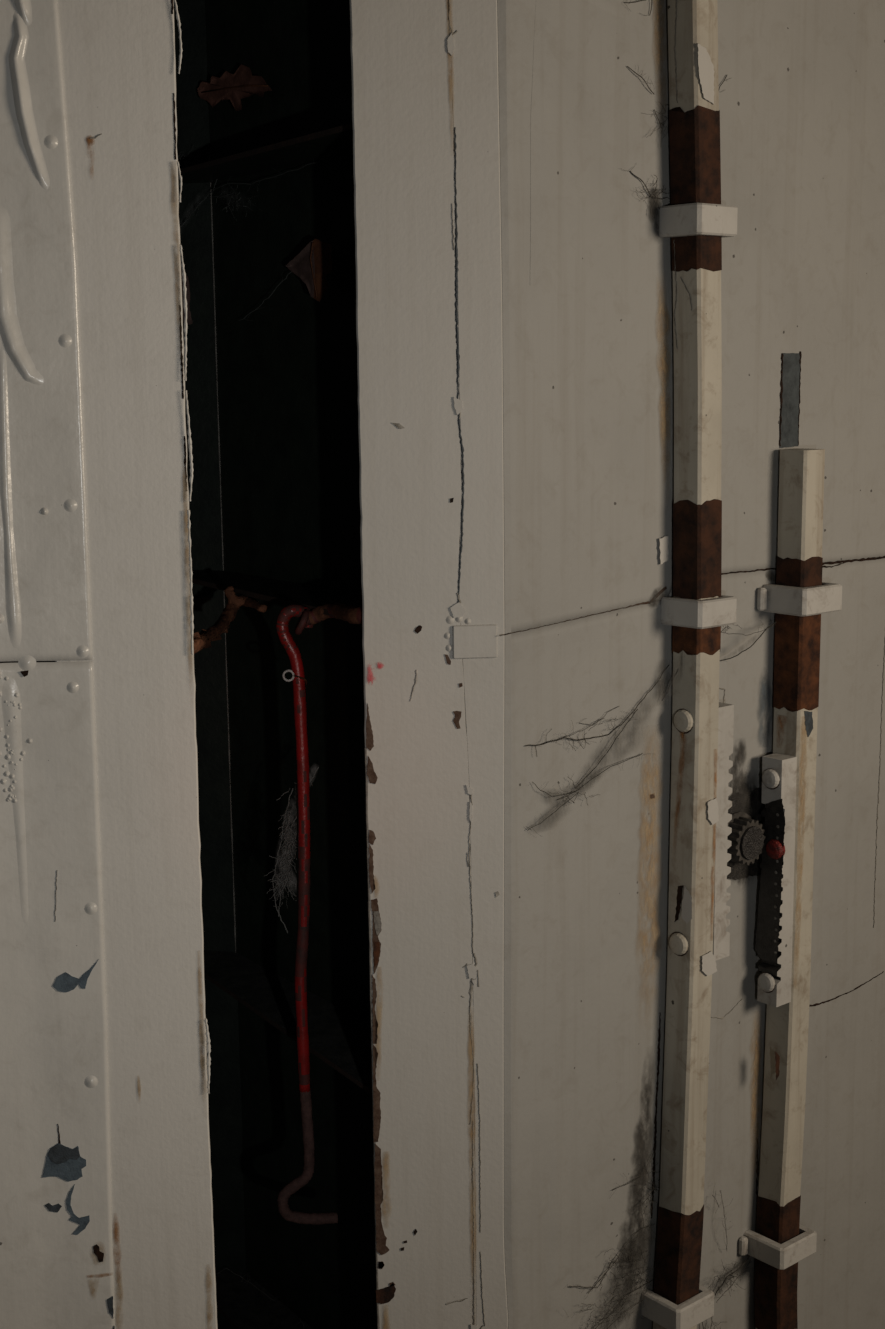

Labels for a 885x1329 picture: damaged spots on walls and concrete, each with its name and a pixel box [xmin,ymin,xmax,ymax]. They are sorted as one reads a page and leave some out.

crack [447,0,458,55]
crack [450,127,466,618]
peeling [366,704,378,784]
peeling [53,962,97,992]
peeling [369,830,417,1269]
crack [461,785,485,1329]
peeling [42,1124,90,1235]
peeling [376,1282,396,1304]